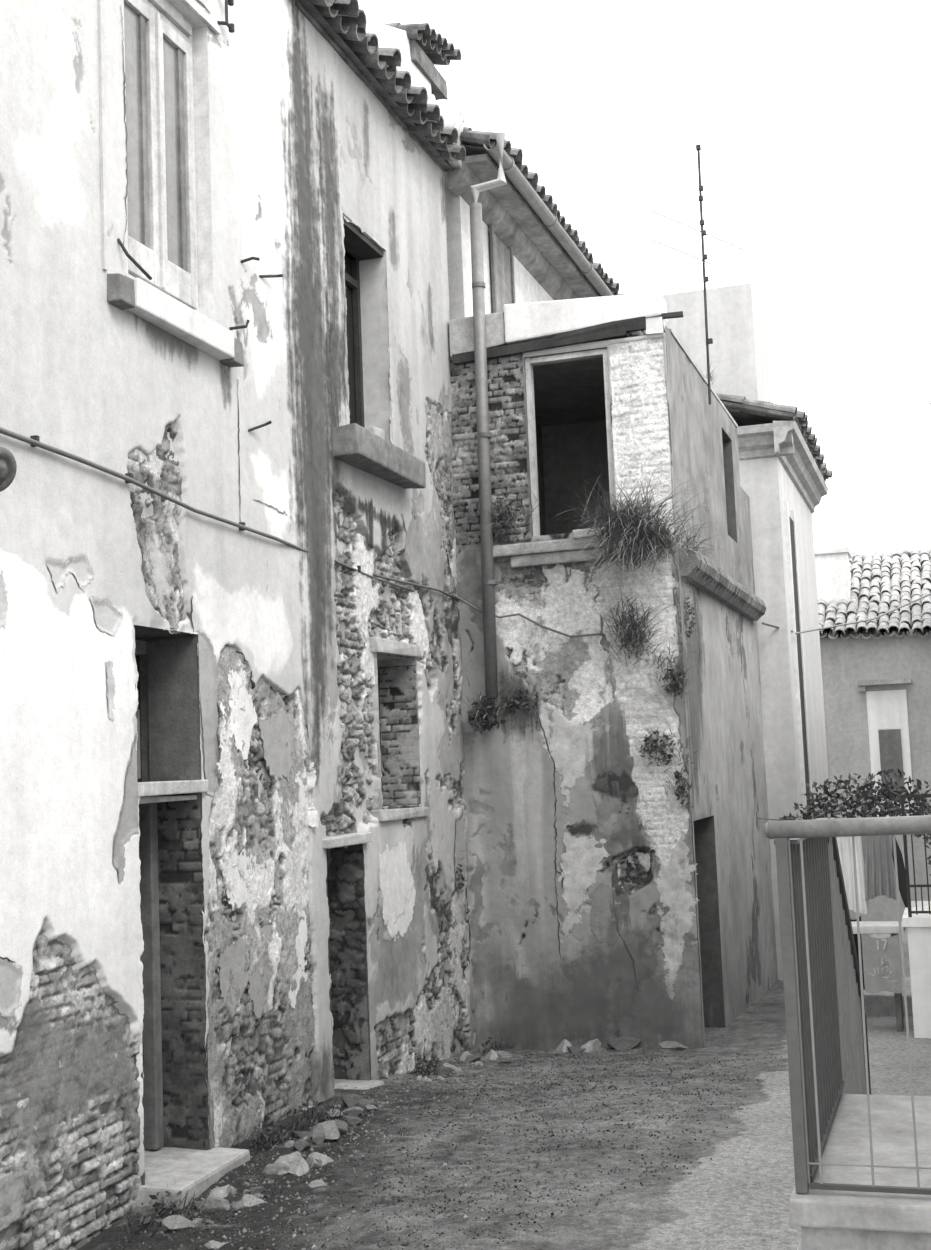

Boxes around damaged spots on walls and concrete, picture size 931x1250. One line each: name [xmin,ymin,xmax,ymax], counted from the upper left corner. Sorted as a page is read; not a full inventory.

peeling [47,556,123,635]
flaking render [127,421,186,631]
water stain [283,0,405,777]
flaking render [398,354,531,622]
flaking render [609,338,674,532]
peeling [113,733,140,883]
flaking render [194,485,433,1148]
flaking render [374,809,470,1080]
flaking render [495,548,690,945]
flaking render [0,926,141,1250]